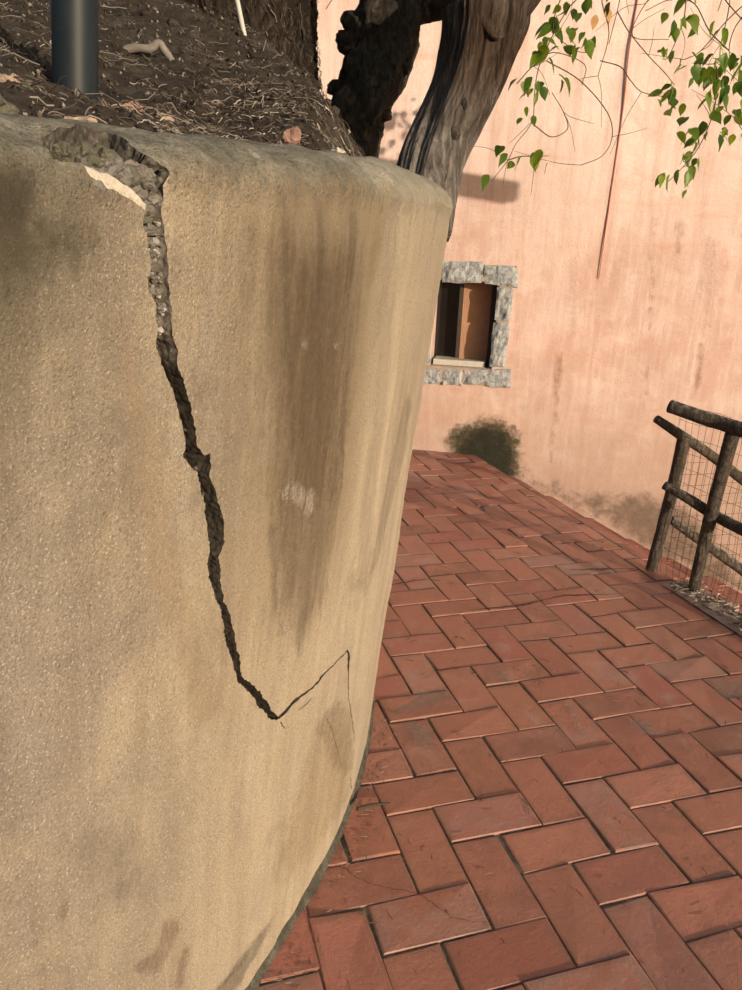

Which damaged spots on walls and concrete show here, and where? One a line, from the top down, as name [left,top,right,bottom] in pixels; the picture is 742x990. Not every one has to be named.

spalling [40,124,174,296]
crack [143,221,355,788]
water stain [445,420,520,476]